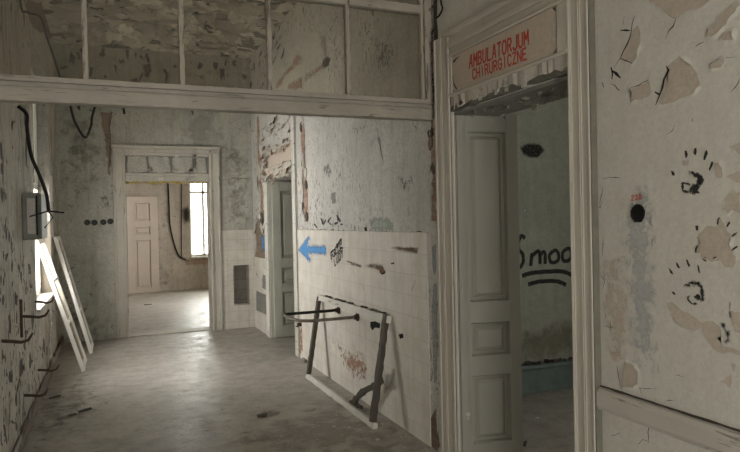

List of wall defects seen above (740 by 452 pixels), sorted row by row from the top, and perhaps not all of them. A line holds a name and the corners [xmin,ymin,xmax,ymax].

peeling [50,0,305,92]
peeling [614,16,643,67]
peeling [612,52,703,107]
peeling [649,0,714,37]
peeling [704,0,740,45]
spalling [97,107,118,180]
flaking render [300,117,309,222]
spalling [249,114,291,314]
peeling [695,171,740,268]
peeling [0,213,54,452]
corrosion [338,346,367,378]
peeling [667,302,740,355]